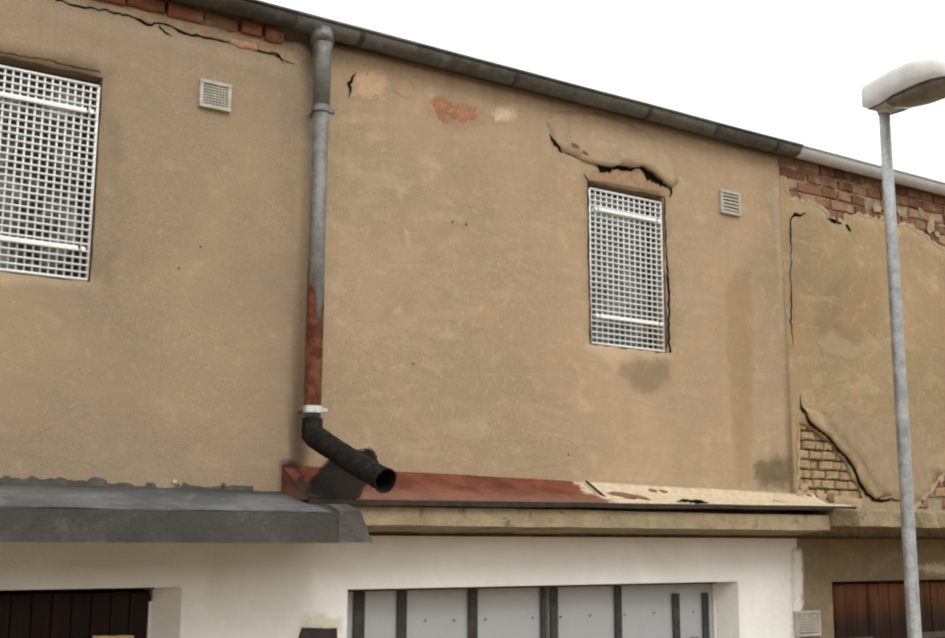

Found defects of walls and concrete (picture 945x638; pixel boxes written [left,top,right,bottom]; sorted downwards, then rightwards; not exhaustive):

flaking render [60,0,312,63]
crack [347,72,356,97]
flaking render [491,107,516,122]
flaking render [589,170,664,192]
flaking render [778,155,884,231]
flaking render [895,185,945,250]
crack [790,212,806,345]
corrosion [304,268,324,406]
peeling [0,475,157,488]
peeling [169,479,253,491]
peeling [606,489,667,500]
flaking render [796,424,860,502]